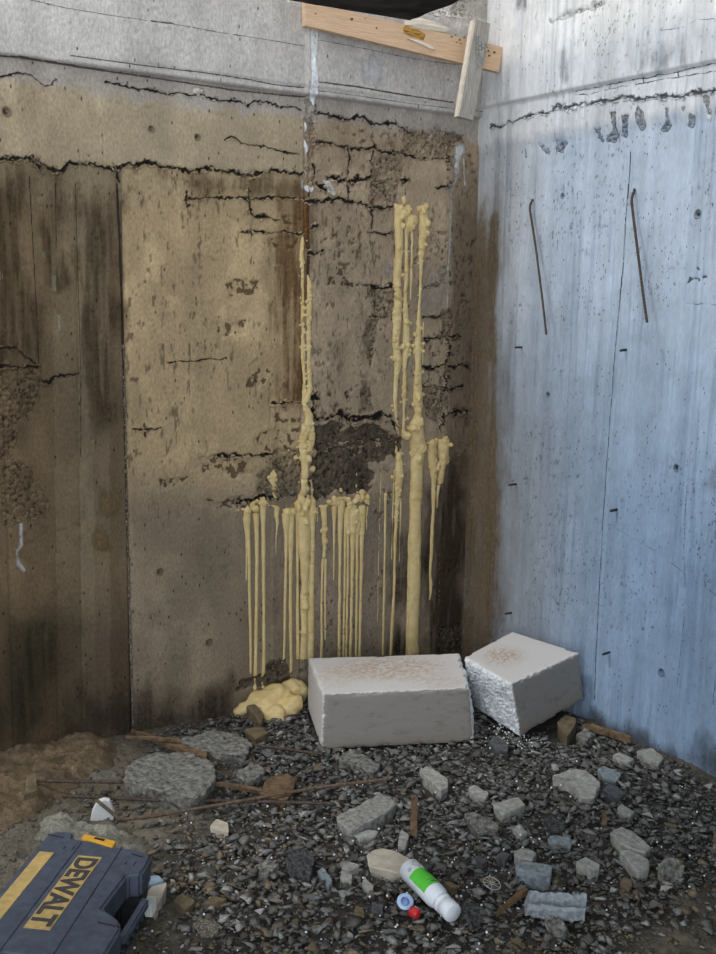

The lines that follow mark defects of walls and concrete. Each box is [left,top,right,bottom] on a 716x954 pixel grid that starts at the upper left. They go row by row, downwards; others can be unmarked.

spalling [549,0,605,24]
crack [0,70,58,87]
crack [0,79,454,257]
damp [0,174,36,362]
damp [77,210,120,423]
spalling [256,406,301,452]
spalling [202,454,250,479]
spalling [0,461,50,527]
spalling [207,496,246,508]
damp [17,523,25,572]